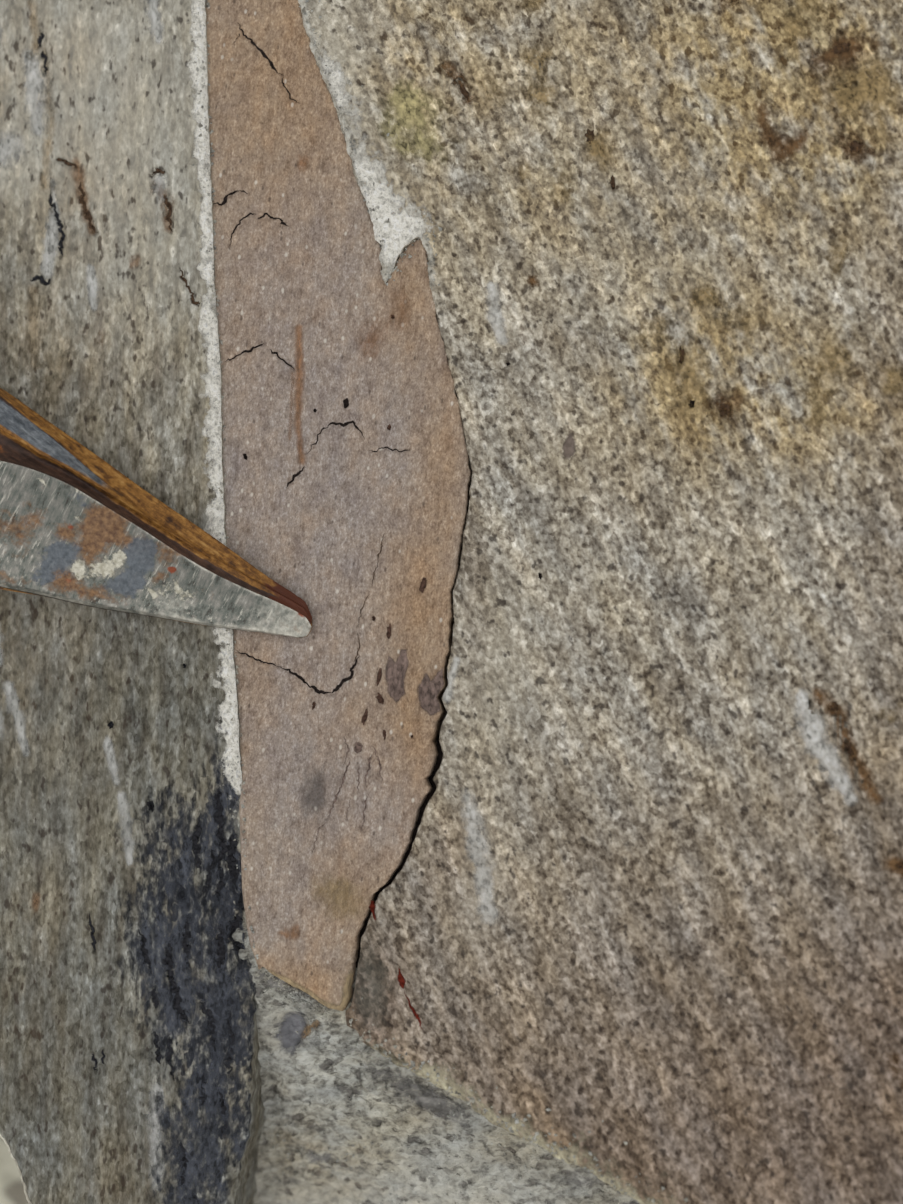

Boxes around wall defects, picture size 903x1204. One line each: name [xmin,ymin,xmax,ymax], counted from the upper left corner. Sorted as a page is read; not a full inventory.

crack [235,24,299,103]
spalling [298,0,435,284]
rust [74,160,95,234]
crack [214,190,290,249]
damp [187,0,226,546]
crack [226,344,294,369]
crack [286,421,407,488]
crack [239,534,384,694]
spalling [362,668,384,725]
damp [104,739,117,781]
crack [356,741,443,969]
damp [118,627,304,1204]